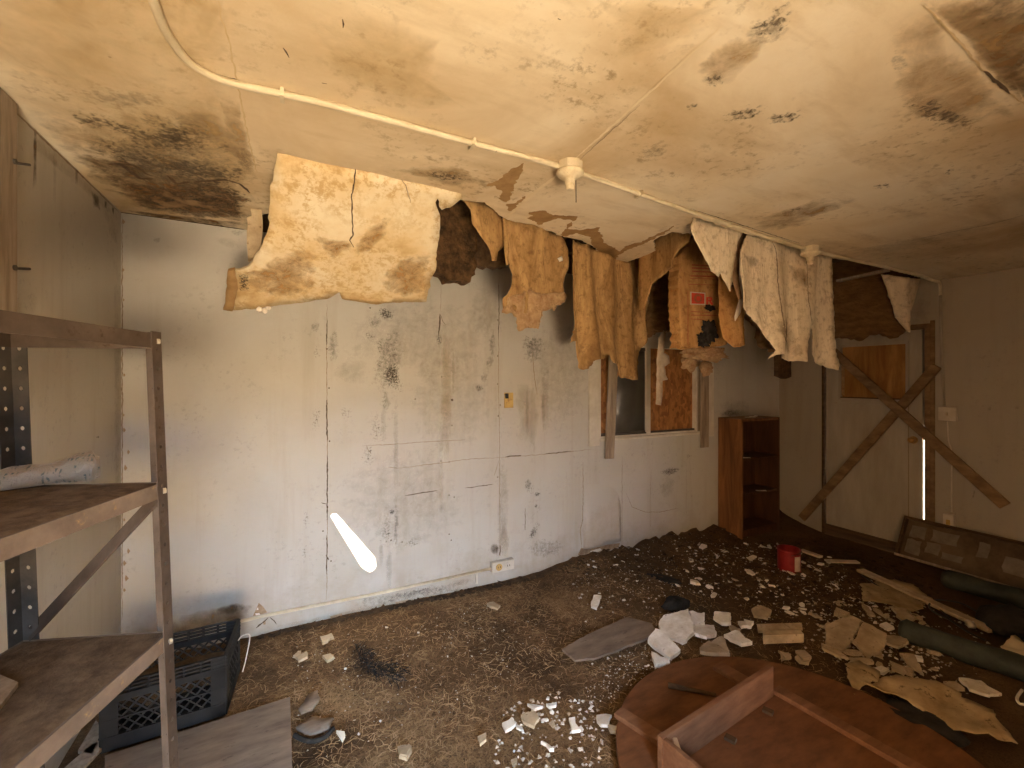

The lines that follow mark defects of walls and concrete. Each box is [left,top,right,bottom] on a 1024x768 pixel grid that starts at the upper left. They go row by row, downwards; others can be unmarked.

damp [73,1,258,217]
damp [912,0,1024,126]
crack [348,169,356,247]
spalling [223,267,238,311]